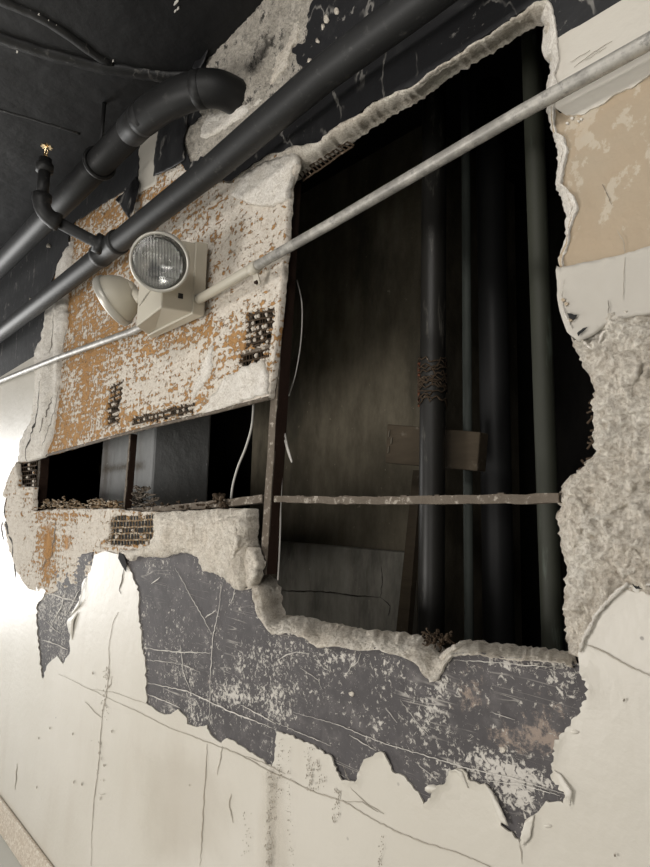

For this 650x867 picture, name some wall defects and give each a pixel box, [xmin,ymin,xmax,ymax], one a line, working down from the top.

spalling [48,0,560,456]
spalling [546,76,650,657]
crack [59,569,490,867]
peeling [3,460,588,846]